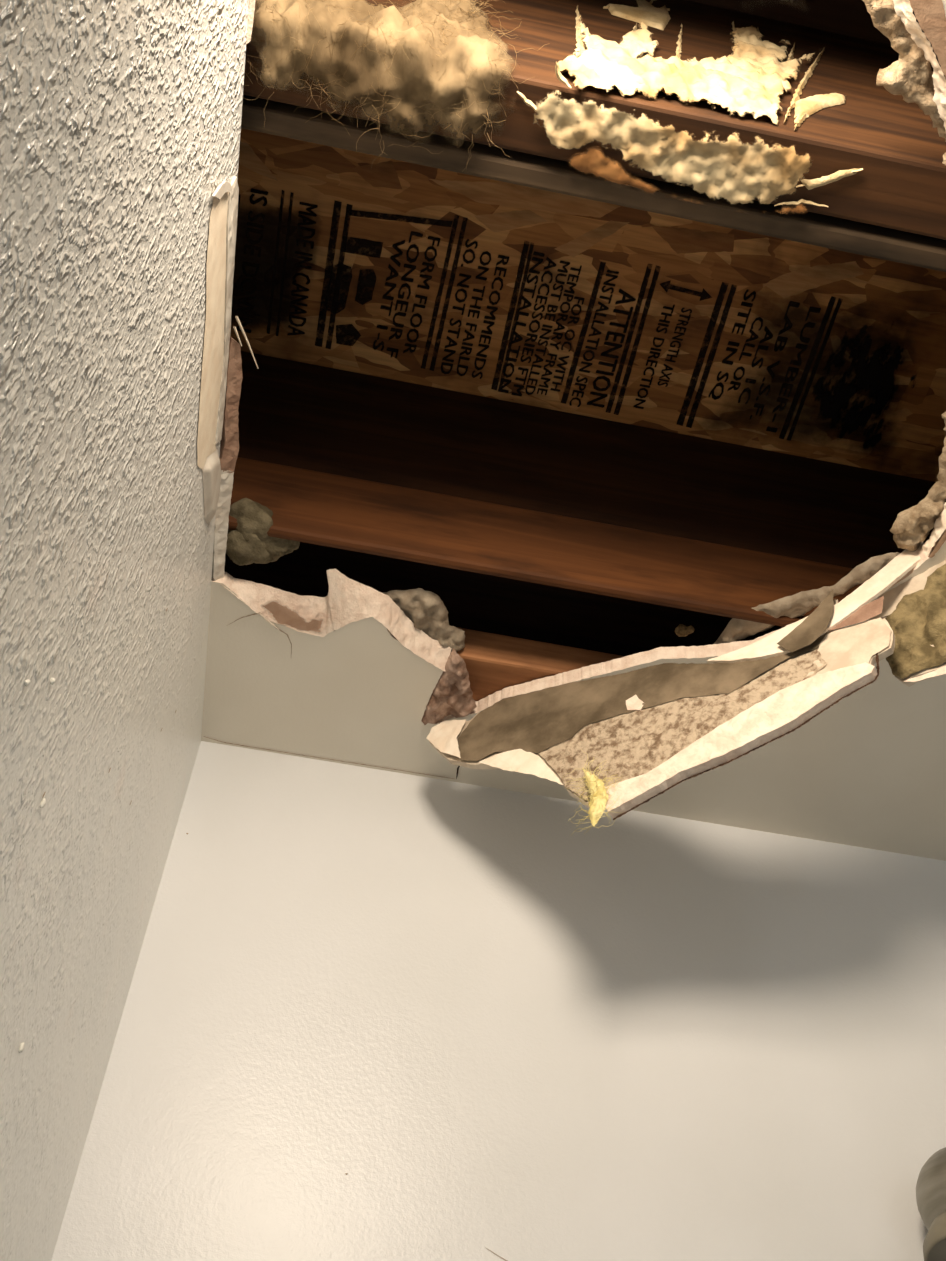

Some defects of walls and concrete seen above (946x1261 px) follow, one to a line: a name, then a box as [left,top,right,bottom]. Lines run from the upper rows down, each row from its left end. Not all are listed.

spalling [862,0,946,165]
peeling [197,176,239,526]
spalling [890,412,946,558]
spalling [221,569,477,725]
peeling [626,695,644,712]